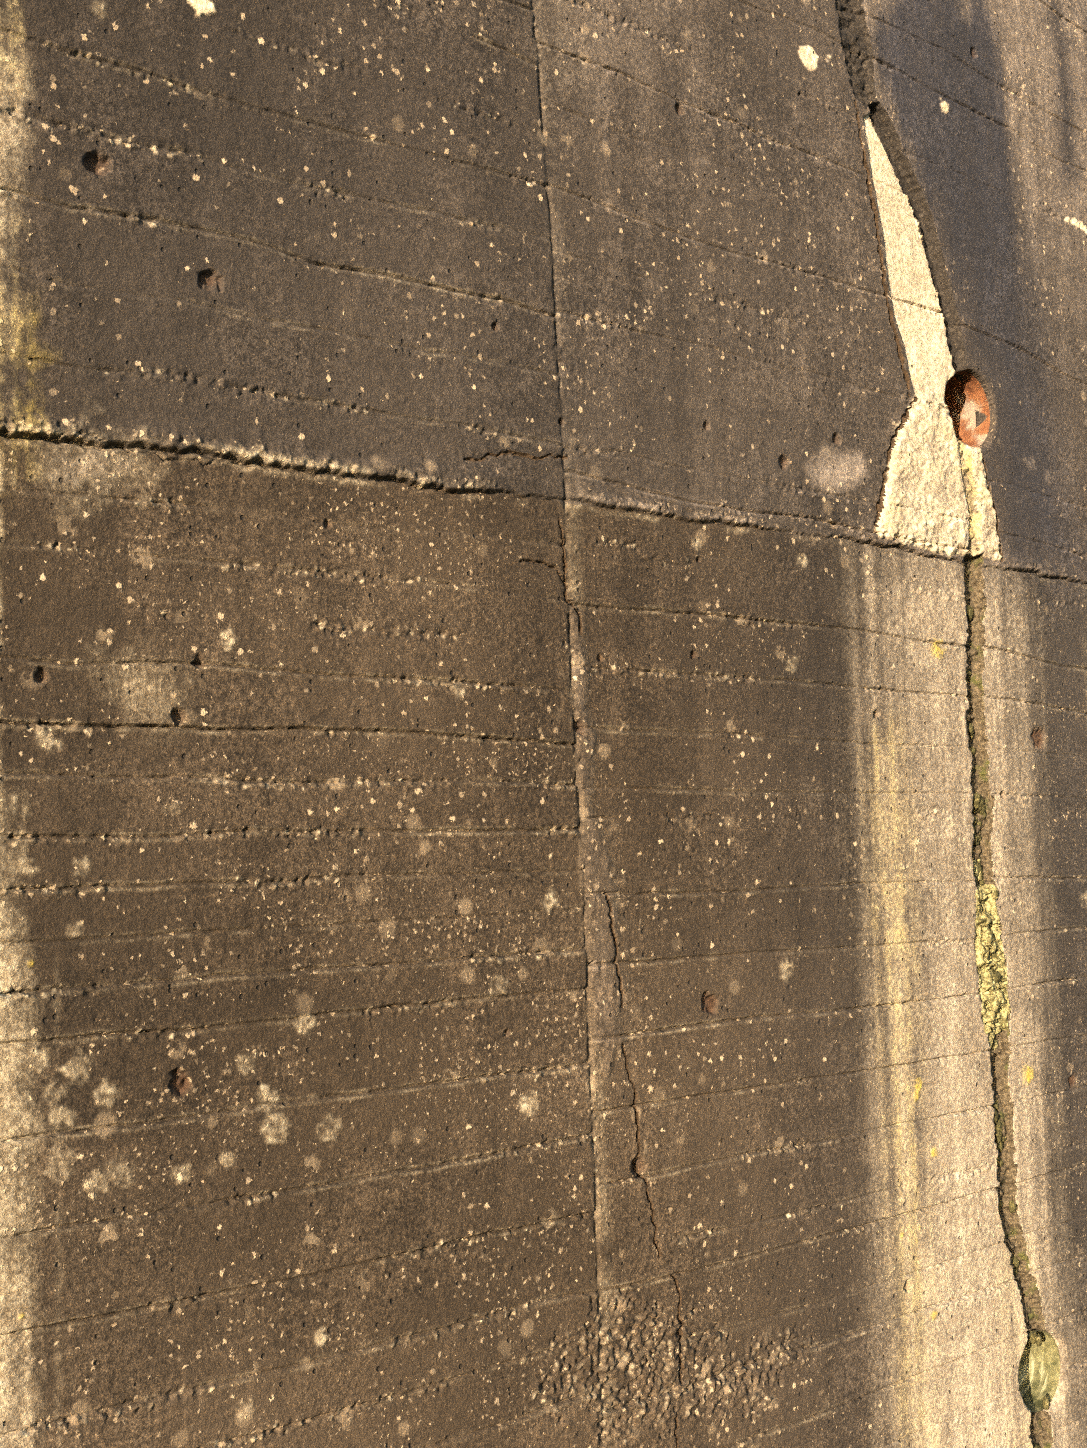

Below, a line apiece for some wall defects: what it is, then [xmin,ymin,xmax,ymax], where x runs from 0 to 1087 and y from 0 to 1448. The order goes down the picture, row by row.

leakage [500,0,720,136]
peeling [938,96,951,115]
crack [834,0,968,533]
spalling [863,112,956,403]
crack [52,431,268,470]
crack [463,449,568,462]
crack [532,518,582,635]
leakage [800,0,1087,1448]
crack [603,892,623,1008]
crack [952,420,1046,1347]
crack [621,1043,685,1448]
crack [1023,1396,1054,1448]